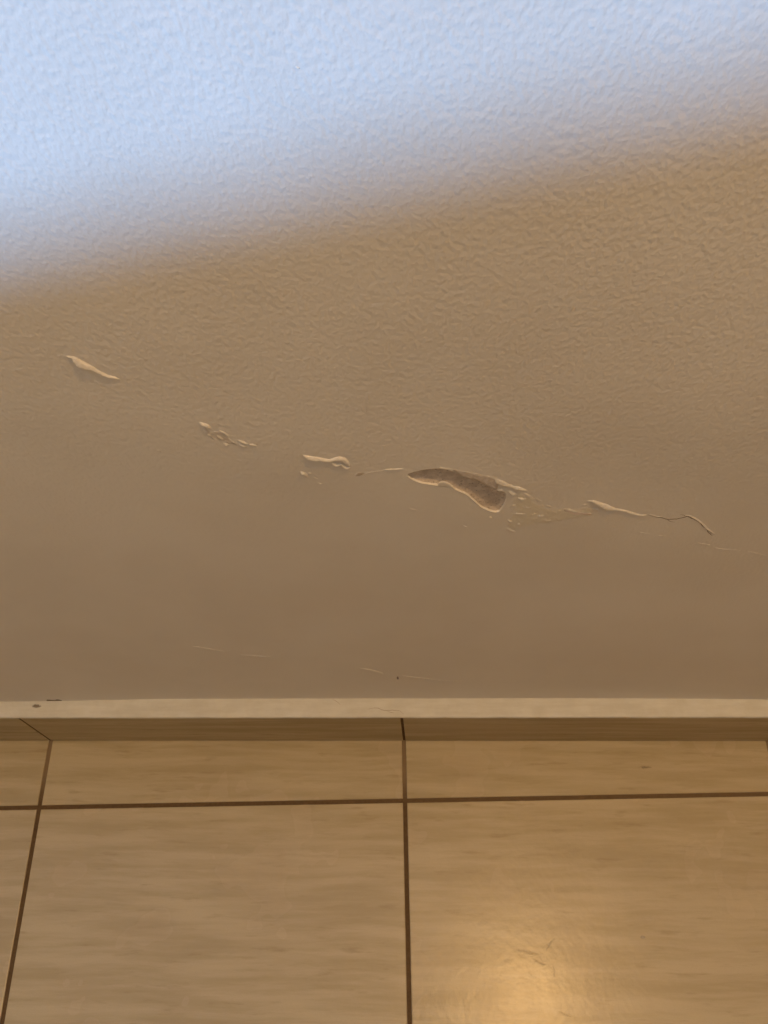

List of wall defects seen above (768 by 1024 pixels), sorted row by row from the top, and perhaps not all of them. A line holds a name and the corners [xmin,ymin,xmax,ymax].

peeling [66,356,129,390]
peeling [300,455,365,485]
spalling [407,467,544,533]
peeling [564,500,647,517]